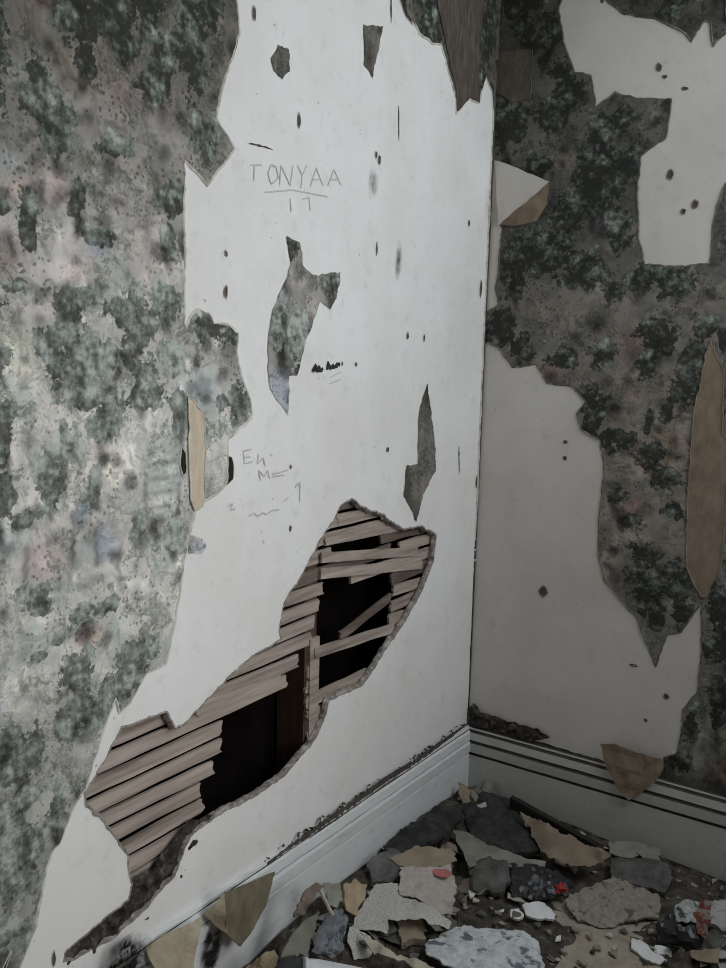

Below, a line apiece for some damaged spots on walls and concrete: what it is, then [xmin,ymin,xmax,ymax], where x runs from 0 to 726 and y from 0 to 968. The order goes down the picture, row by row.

peeling [558,0,726,267]
peeling [20,0,503,968]
peeling [469,342,703,767]
leakage [107,936,145,968]
leakage [203,931,221,968]